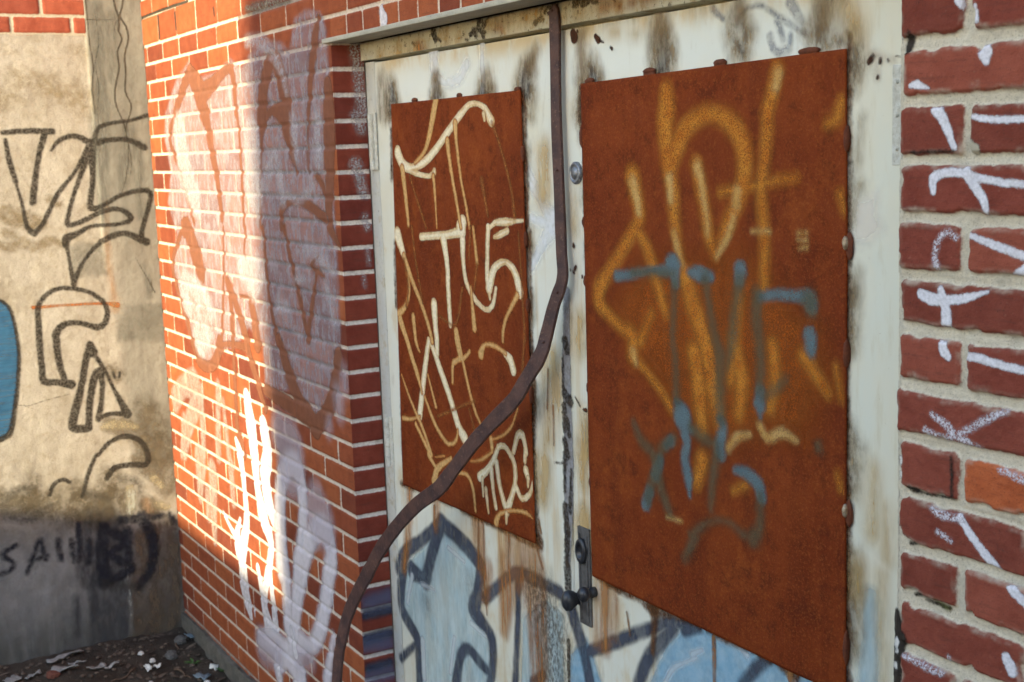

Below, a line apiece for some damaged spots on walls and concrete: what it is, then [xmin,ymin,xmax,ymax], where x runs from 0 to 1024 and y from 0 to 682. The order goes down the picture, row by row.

corrosion [430,78,442,100]
corrosion [570,28,613,126]
corrosion [516,52,548,357]
peeling [556,287,574,590]
corrosion [575,397,589,482]
corrosion [847,370,857,500]
corrosion [460,352,562,682]
corrosion [597,578,685,654]
corrosion [707,631,741,682]